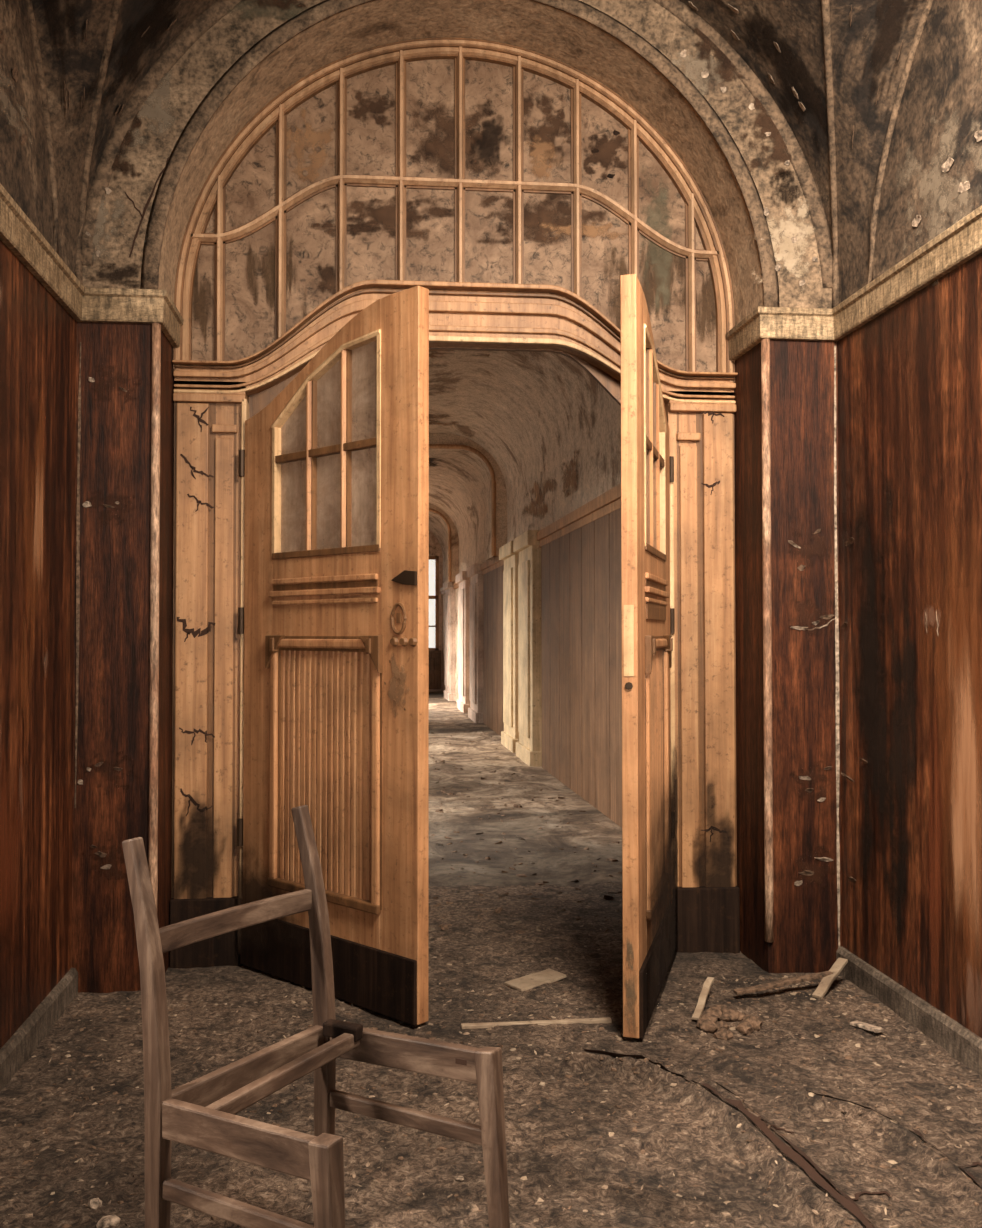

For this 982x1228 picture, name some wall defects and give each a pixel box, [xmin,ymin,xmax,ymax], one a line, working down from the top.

water stain [771,170,798,207]
water stain [91,264,138,288]
crack [180,407,214,512]
crack [177,617,215,642]
crack [179,727,215,745]
crack [180,788,212,816]
water stain [174,805,219,899]
water stain [694,785,734,888]
crack [584,1049,890,1228]
crack [806,1090,982,1185]